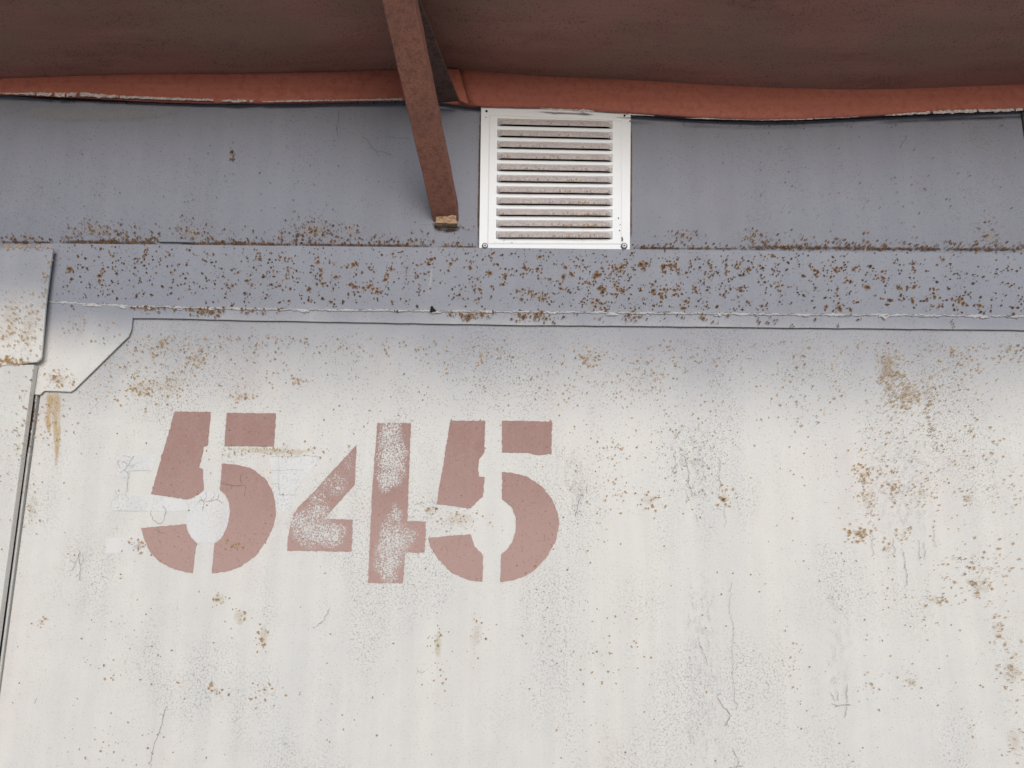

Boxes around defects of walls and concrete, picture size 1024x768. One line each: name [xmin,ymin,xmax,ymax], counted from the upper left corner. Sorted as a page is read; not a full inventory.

rust [8,95,194,105]
rust [643,112,994,137]
rust [0,117,1024,610]